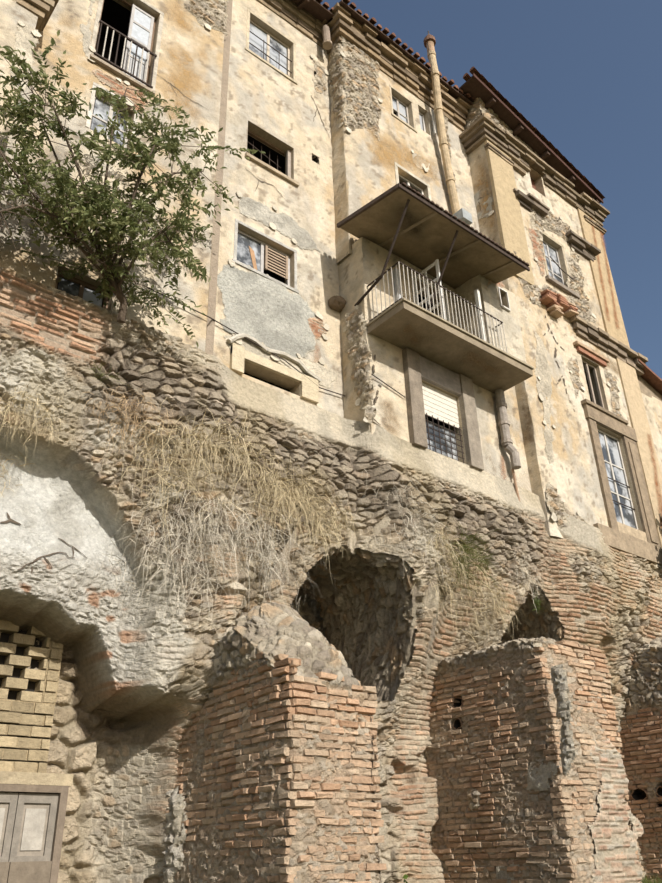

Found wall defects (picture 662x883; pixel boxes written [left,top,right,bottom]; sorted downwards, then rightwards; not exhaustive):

spalling [184,0,229,36]
spalling [310,35,383,142]
peeling [217,259,337,389]
spalling [343,305,378,424]
spalling [517,208,596,324]